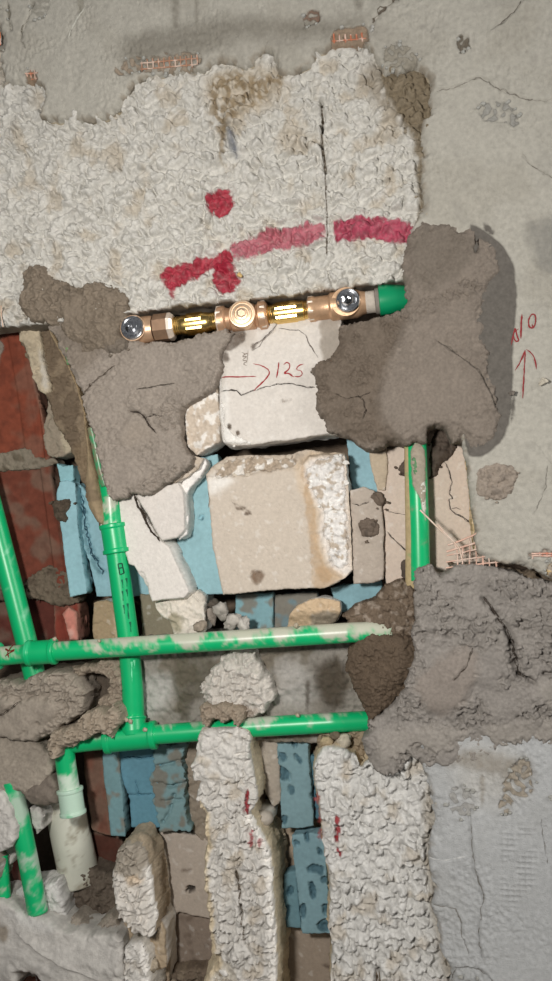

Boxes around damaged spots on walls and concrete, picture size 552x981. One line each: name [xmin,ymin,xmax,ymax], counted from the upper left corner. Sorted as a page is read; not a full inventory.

spalling [115,52,202,78]
spalling [381,40,432,213]
crack [439,77,548,102]
spalling [19,331,75,460]
spalling [214,404,296,478]
spalling [307,454,350,568]
crack [445,463,469,522]
peeling [443,784,478,821]
spalling [498,756,538,816]
crack [431,829,492,980]